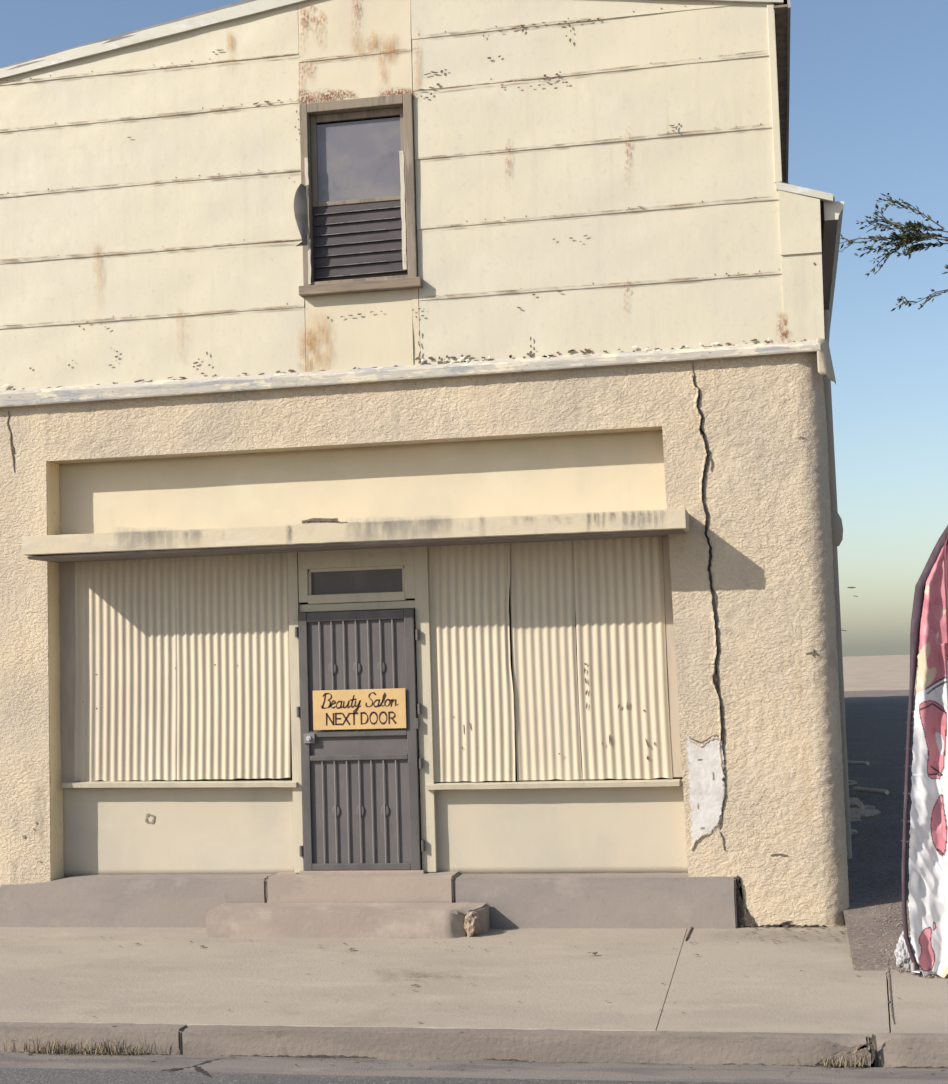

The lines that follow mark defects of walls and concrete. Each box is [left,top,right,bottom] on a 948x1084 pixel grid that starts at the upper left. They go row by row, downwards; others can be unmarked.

rust [299,91,354,103]
peeling [415,331,493,365]
peeling [509,336,771,359]
crack [7,411,15,472]
crack [690,373,726,851]
spalling [686,735,725,850]
spalling [463,911,481,937]
crack [722,972,948,1069]